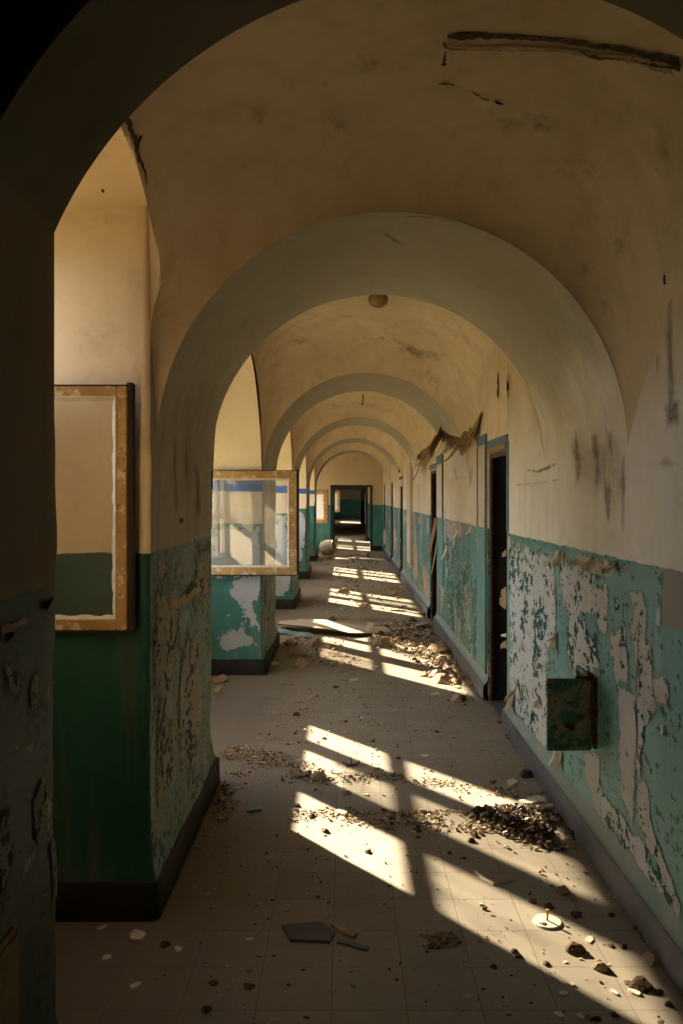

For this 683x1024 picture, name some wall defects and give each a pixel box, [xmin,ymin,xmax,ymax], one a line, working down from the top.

crack [438,32,681,97]
crack [126,118,158,206]
flaking render [411,411,482,481]
peeling [211,511,305,651]
peeling [383,515,477,661]
peeling [499,536,680,919]